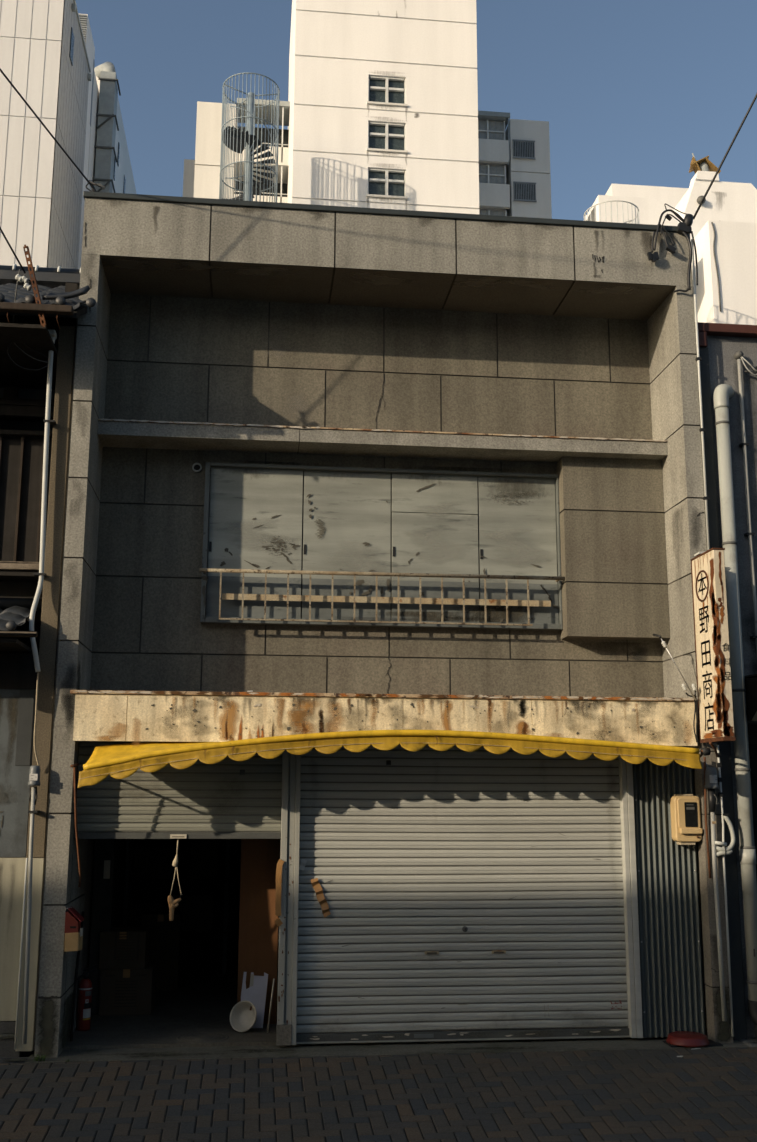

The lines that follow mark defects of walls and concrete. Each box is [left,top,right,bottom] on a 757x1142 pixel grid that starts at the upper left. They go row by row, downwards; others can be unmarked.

crack [375,373,385,429]
rust [154,691,399,741]
rust [418,694,459,730]